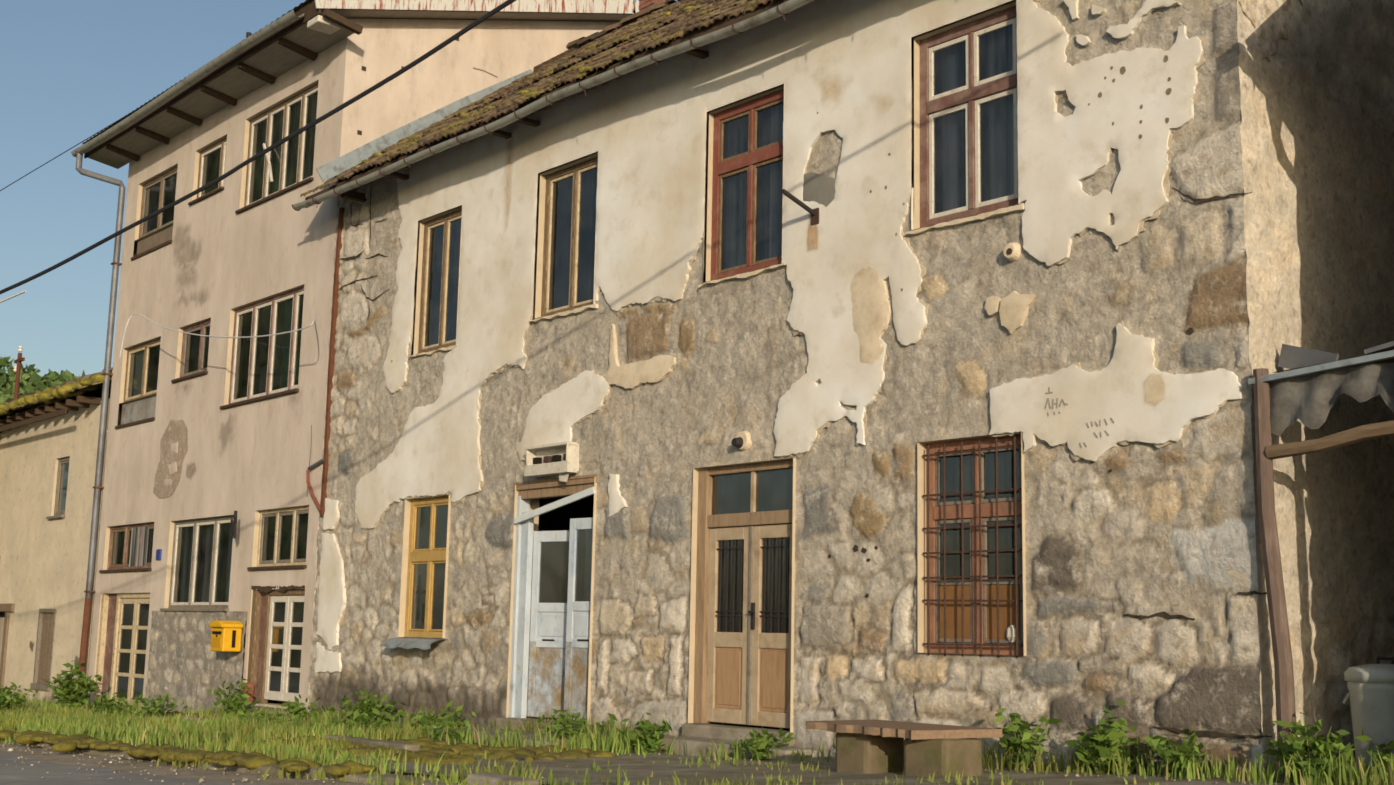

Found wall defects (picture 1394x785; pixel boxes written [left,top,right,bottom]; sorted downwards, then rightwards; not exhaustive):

spalling [307,0,1293,778]
spalling [153,419,188,498]
crack [1123,611,1195,620]